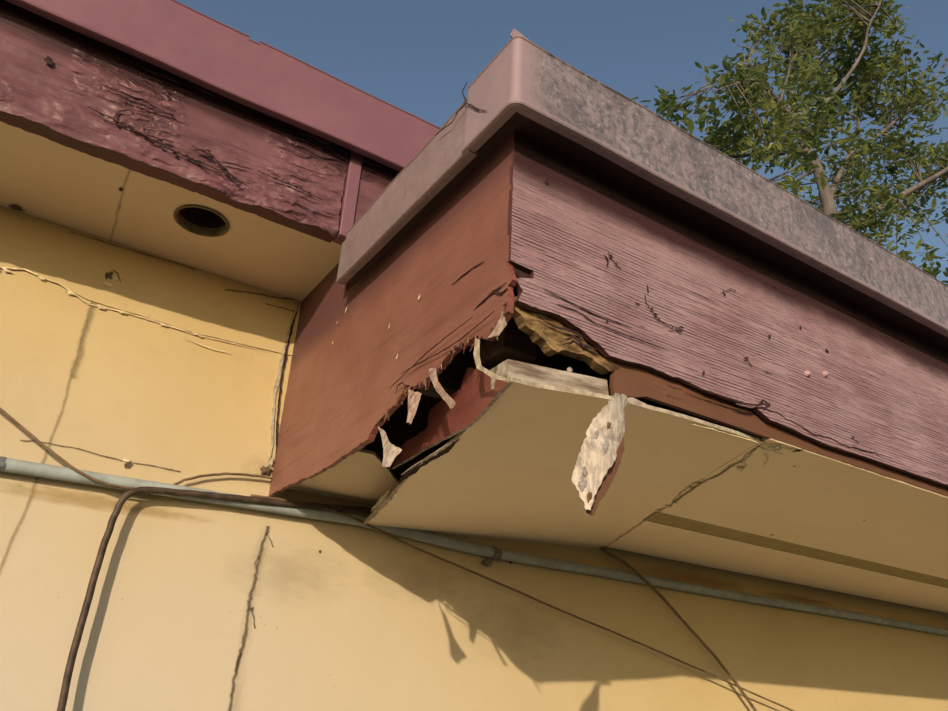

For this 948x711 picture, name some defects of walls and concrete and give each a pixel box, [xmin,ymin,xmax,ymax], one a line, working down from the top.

crack [87,96,323,214]
crack [224,289,296,312]
peeling [473,311,511,382]
peeling [544,289,666,350]
peeling [378,426,402,467]
peeling [407,389,421,424]
peeling [429,368,456,409]
peeling [571,393,646,516]
peeling [686,383,880,455]
crack [603,444,763,548]
crack [228,526,273,711]